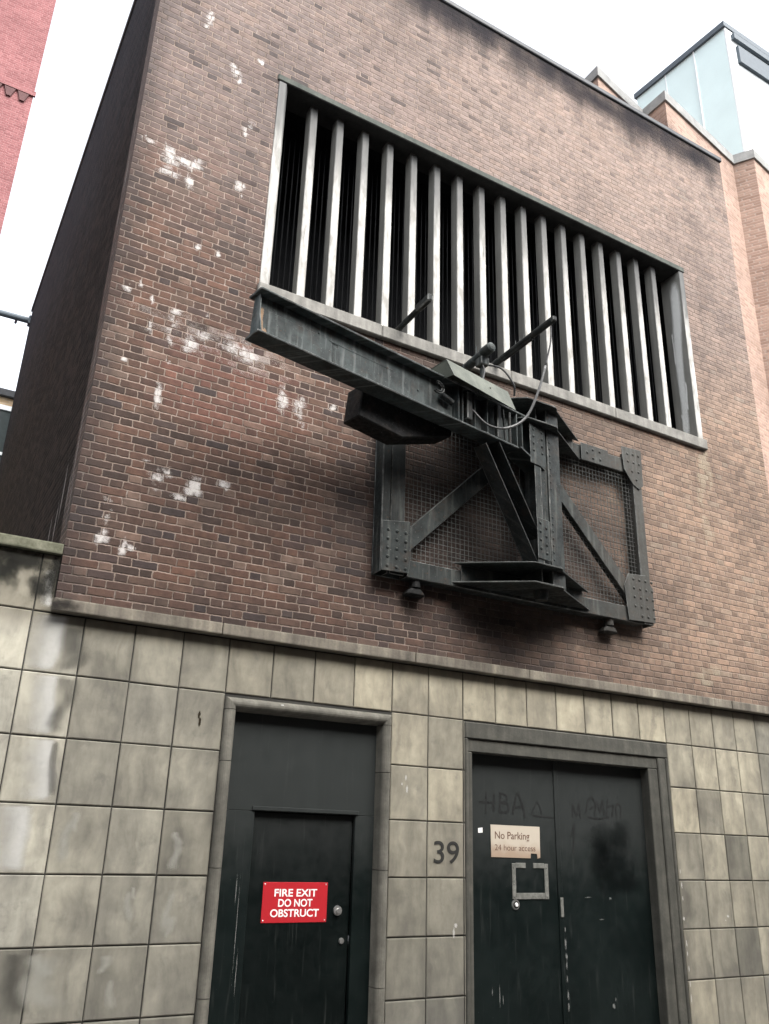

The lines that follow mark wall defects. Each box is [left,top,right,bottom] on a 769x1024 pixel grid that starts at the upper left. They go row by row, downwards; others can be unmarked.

water stain [133,122,205,189]
water stain [118,280,307,431]
water stain [144,460,204,501]
water stain [94,498,136,556]